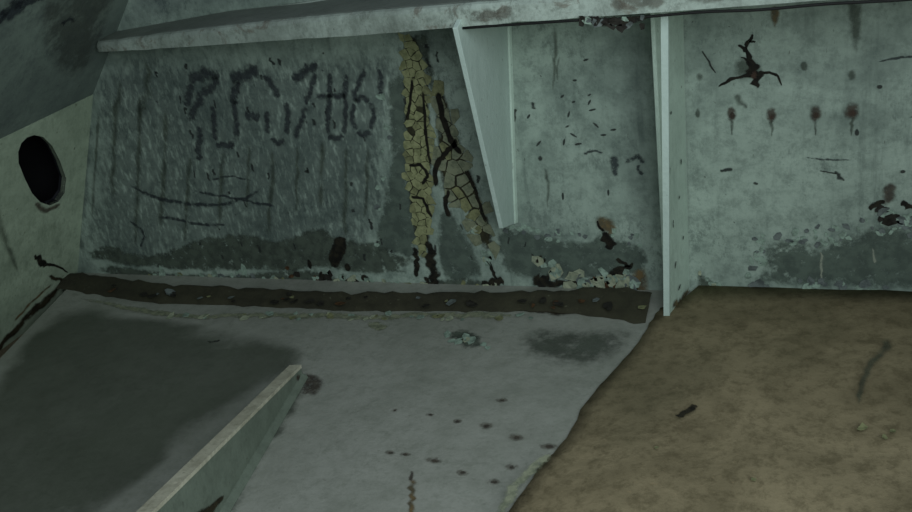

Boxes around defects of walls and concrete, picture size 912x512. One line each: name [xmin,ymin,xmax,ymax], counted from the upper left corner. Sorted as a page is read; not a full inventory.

crack [702,34,782,88]
rust [845,105,858,135]
peeling [92,32,646,286]
peeling [745,184,912,290]
water stain [533,335,608,360]